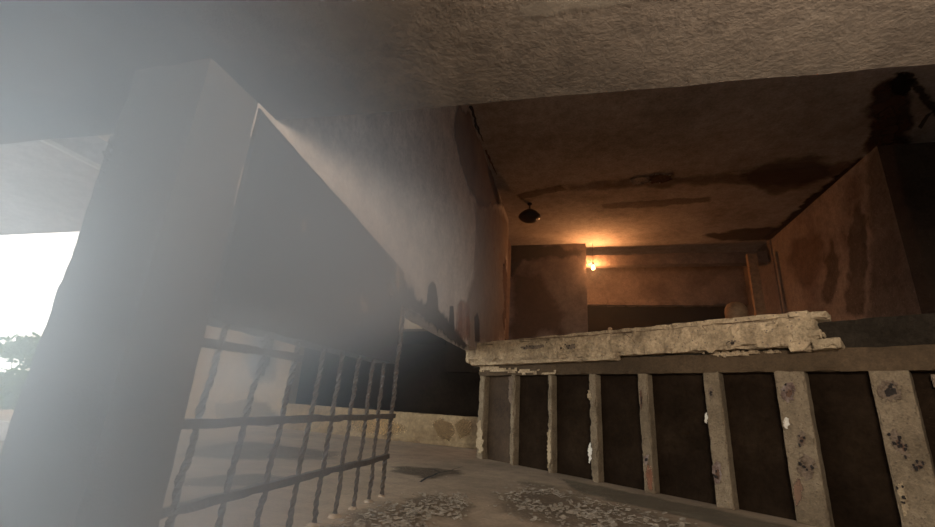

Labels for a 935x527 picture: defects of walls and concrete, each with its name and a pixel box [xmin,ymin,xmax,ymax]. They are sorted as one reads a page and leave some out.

crack [469,105,497,175]
leakage [705,72,935,241]
flaking render [697,340,781,358]
flaking render [790,311,845,352]